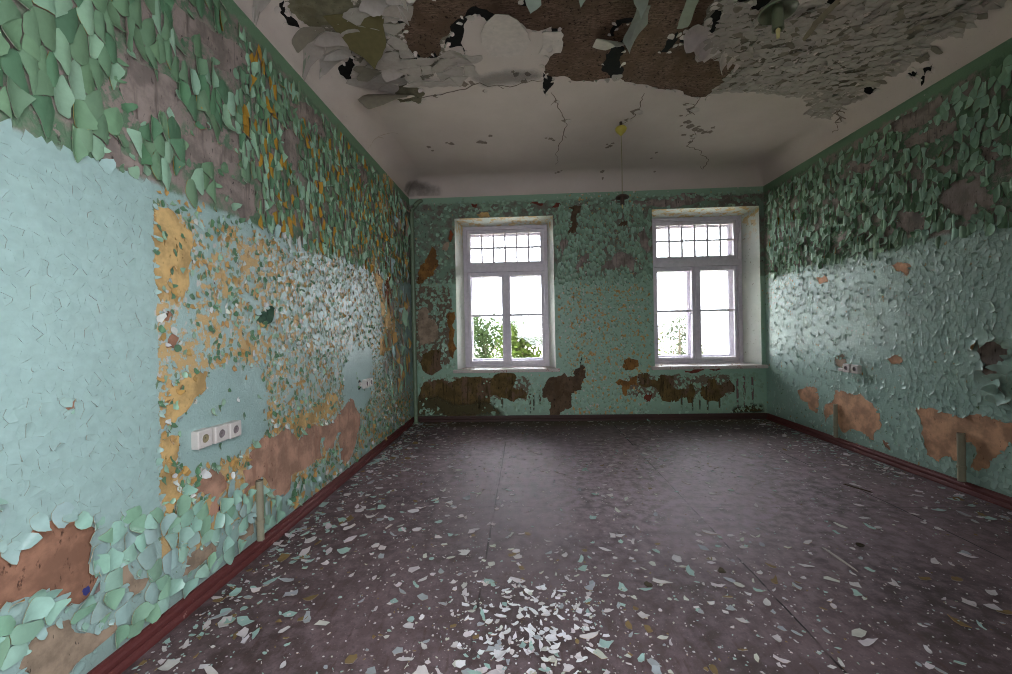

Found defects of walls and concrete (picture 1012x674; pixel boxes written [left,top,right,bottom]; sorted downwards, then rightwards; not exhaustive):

peeling [0,0,765,674]
crack [401,79,571,163]
peeling [292,0,1007,120]
peeling [765,54,1012,495]